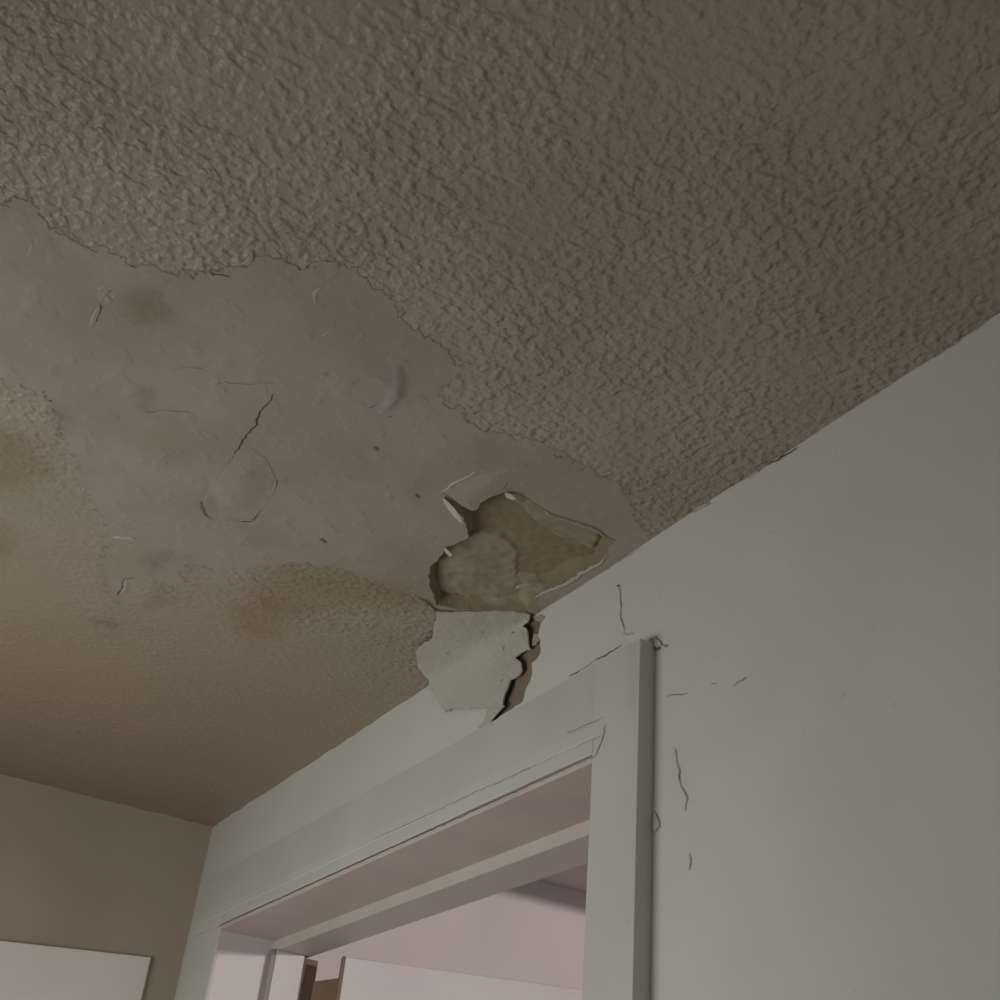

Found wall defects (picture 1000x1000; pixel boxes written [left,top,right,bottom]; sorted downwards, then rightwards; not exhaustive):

crack [220,396,272,472]
peeling [0,197,653,729]
crack [748,448,796,479]
crack [565,550,637,676]
crack [674,748,688,811]